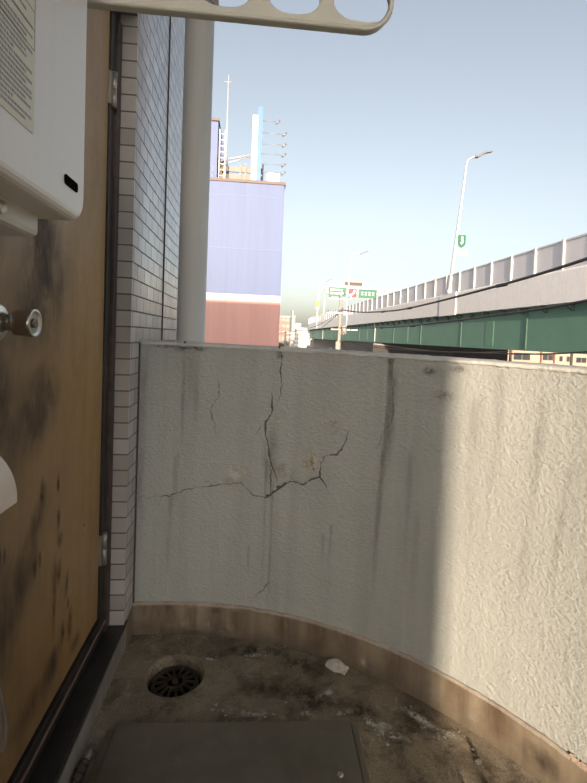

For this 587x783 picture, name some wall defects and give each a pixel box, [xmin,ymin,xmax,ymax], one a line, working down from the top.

crack [144,346,348,499]
leakage [364,711,434,744]